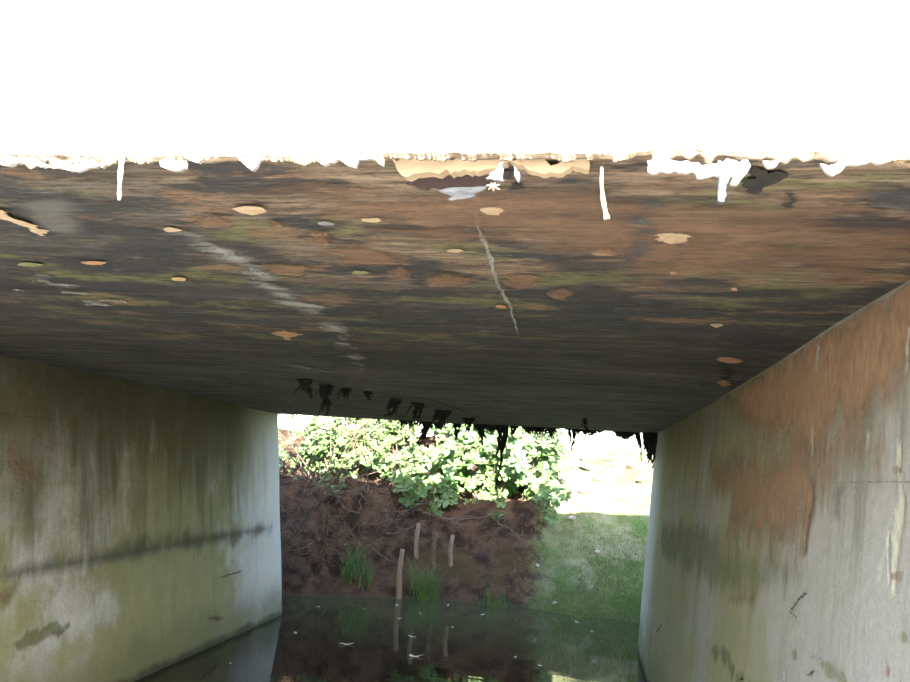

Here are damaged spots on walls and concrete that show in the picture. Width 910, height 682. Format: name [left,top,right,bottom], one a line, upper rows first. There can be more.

flaking render [0,148,128,173]
flaking render [159,153,219,172]
flaking render [238,153,262,172]
spalling [293,149,590,201]
flaking render [647,147,910,194]
spalling [232,206,267,215]
spalling [480,207,503,215]